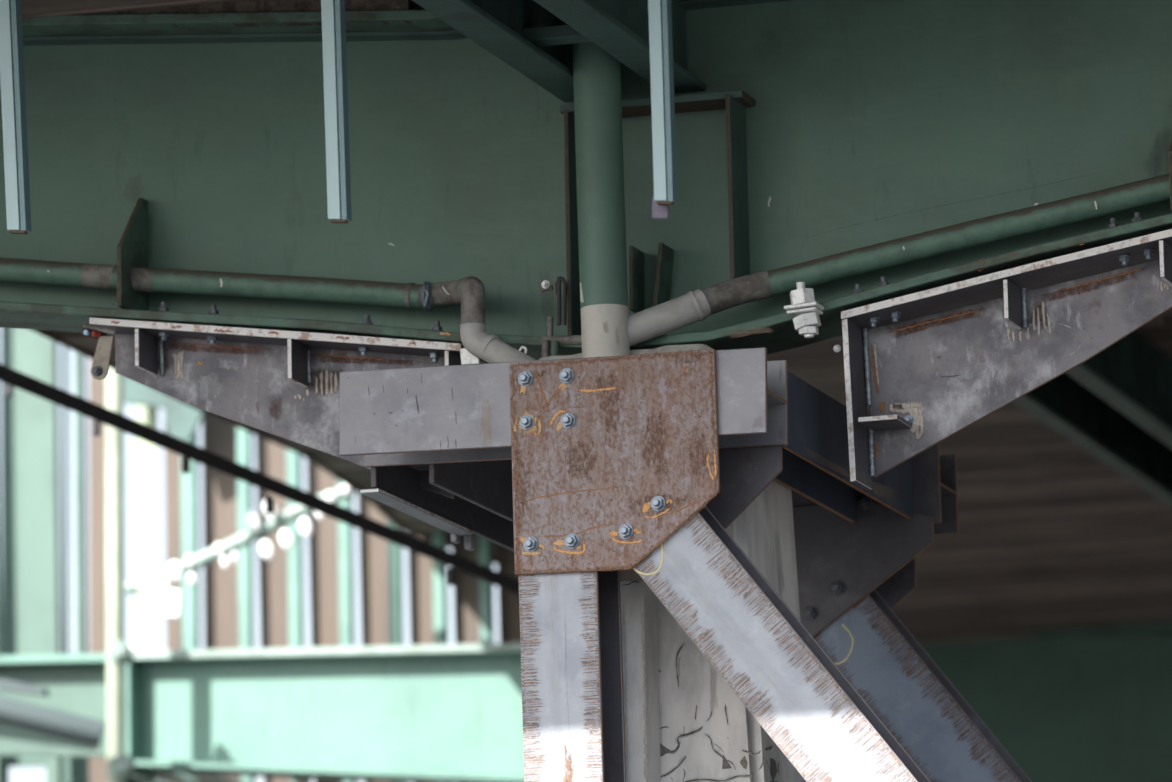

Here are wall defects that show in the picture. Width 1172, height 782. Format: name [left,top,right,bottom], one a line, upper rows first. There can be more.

corrosion [1043,268,1144,300]
corrosion [889,308,982,337]
corrosion [171,329,266,365]
corrosion [315,353,411,365]
corrosion [511,343,938,782]
corrosion [851,595,1019,782]
crack [659,644,779,782]